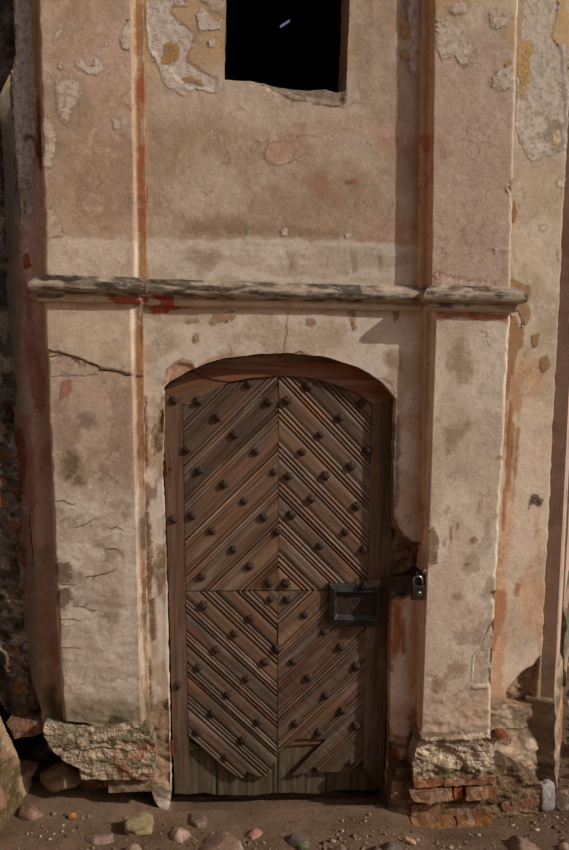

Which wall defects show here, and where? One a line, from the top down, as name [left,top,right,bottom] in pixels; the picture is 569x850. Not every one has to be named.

peeling [0,0,104,216]
peeling [144,0,226,96]
peeling [434,0,478,67]
peeling [488,0,569,161]
peeling [43,192,65,239]
peeling [48,356,99,401]
crack [46,350,127,376]
peeling [436,277,540,414]
flaking render [0,120,44,739]
peeling [55,561,75,609]
spalling [389,517,439,600]
spalling [505,654,543,709]